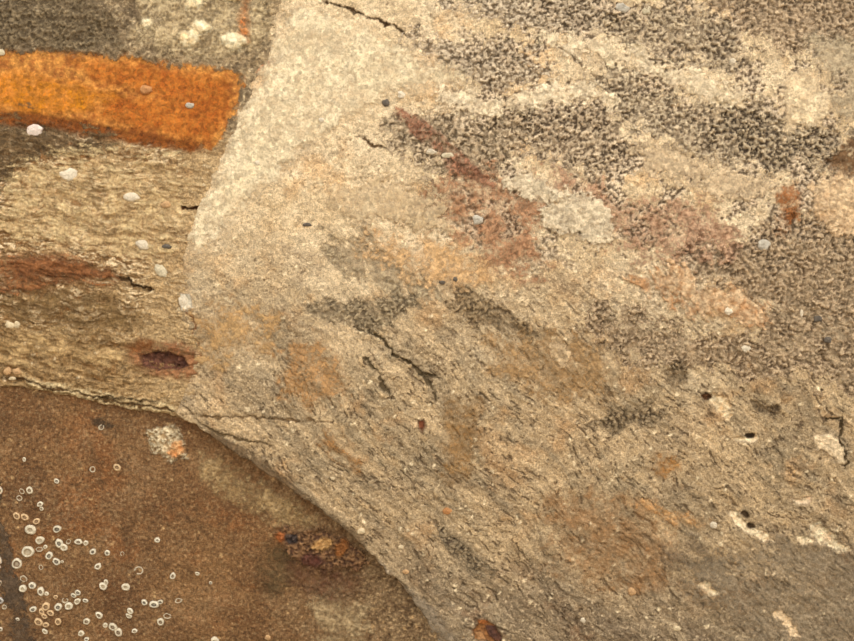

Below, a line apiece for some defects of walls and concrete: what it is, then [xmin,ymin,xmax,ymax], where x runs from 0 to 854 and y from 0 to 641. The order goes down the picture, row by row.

crack [325,1,407,36]
rust [0,48,246,151]
damp [0,0,625,259]
damp [536,20,753,111]
damp [0,288,141,368]
damp [25,378,174,412]
crack [354,326,438,400]